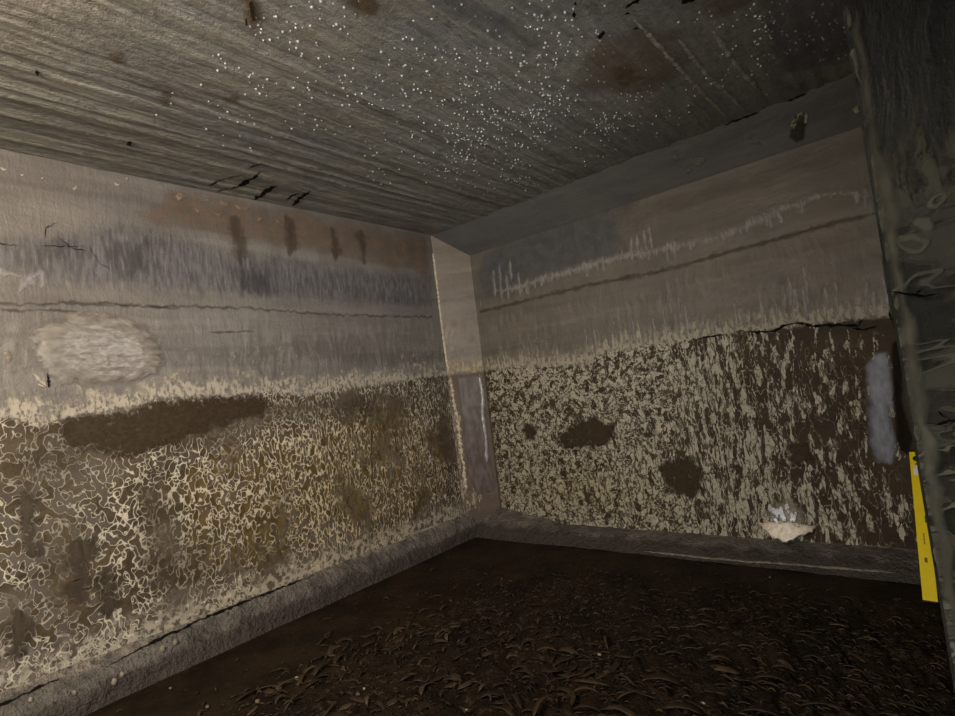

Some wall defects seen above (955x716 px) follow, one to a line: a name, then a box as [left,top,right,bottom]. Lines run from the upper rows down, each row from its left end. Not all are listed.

corrosion [243,0,259,26]
water stain [773,0,847,70]
crack [209,163,311,206]
water stain [0,230,428,303]
water stain [484,13,955,665]
crack [690,289,936,341]
water stain [0,254,494,693]